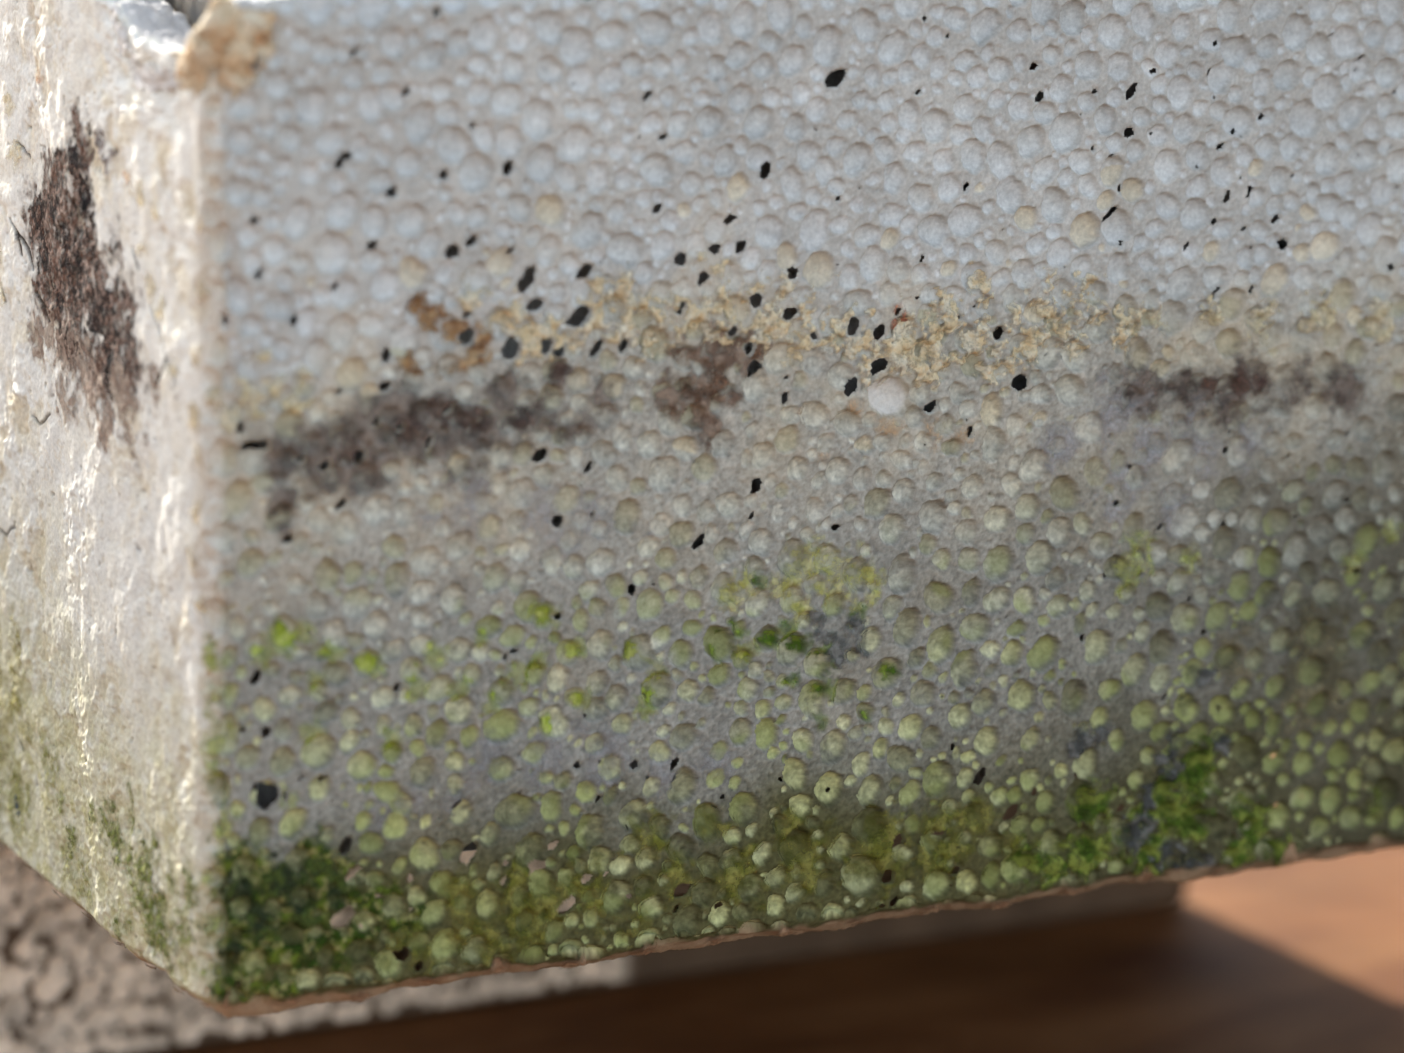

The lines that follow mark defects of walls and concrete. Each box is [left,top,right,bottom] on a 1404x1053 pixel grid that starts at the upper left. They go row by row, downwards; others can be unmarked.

leakage [808,610,869,669]
leakage [651,757,675,784]
leakage [1067,724,1113,759]
leakage [1119,729,1214,870]